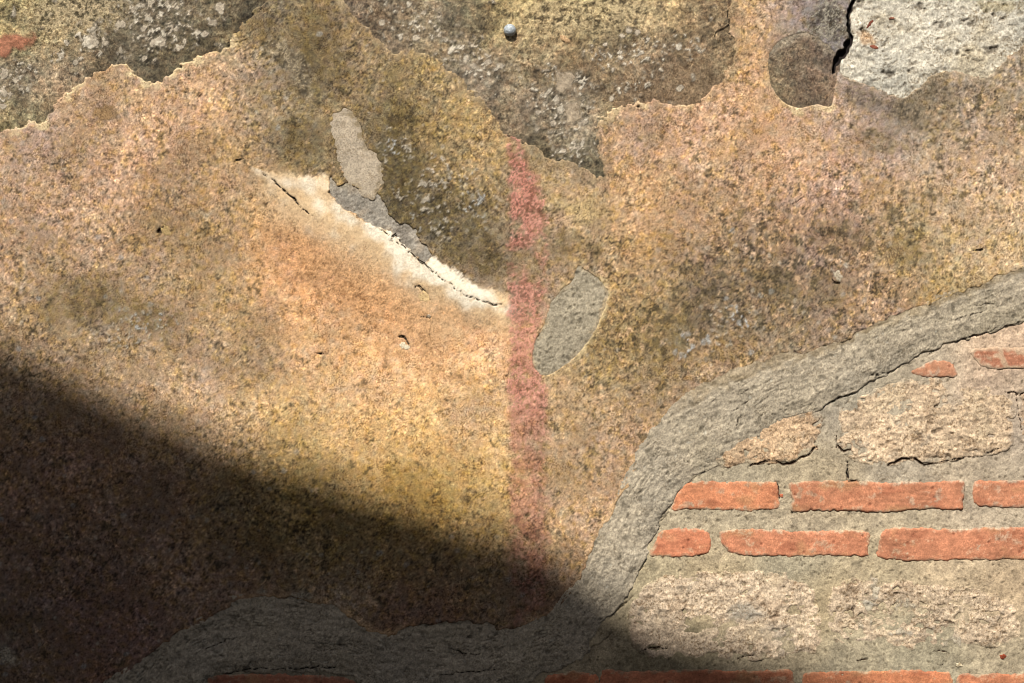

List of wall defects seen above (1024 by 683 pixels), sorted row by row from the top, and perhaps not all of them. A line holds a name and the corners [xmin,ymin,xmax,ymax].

flaking render [0,0,267,132]
flaking render [344,0,736,178]
crack [832,0,855,73]
flaking render [768,0,1024,108]
flaking render [329,177,432,264]
leakage [256,169,514,327]
crack [384,231,497,306]